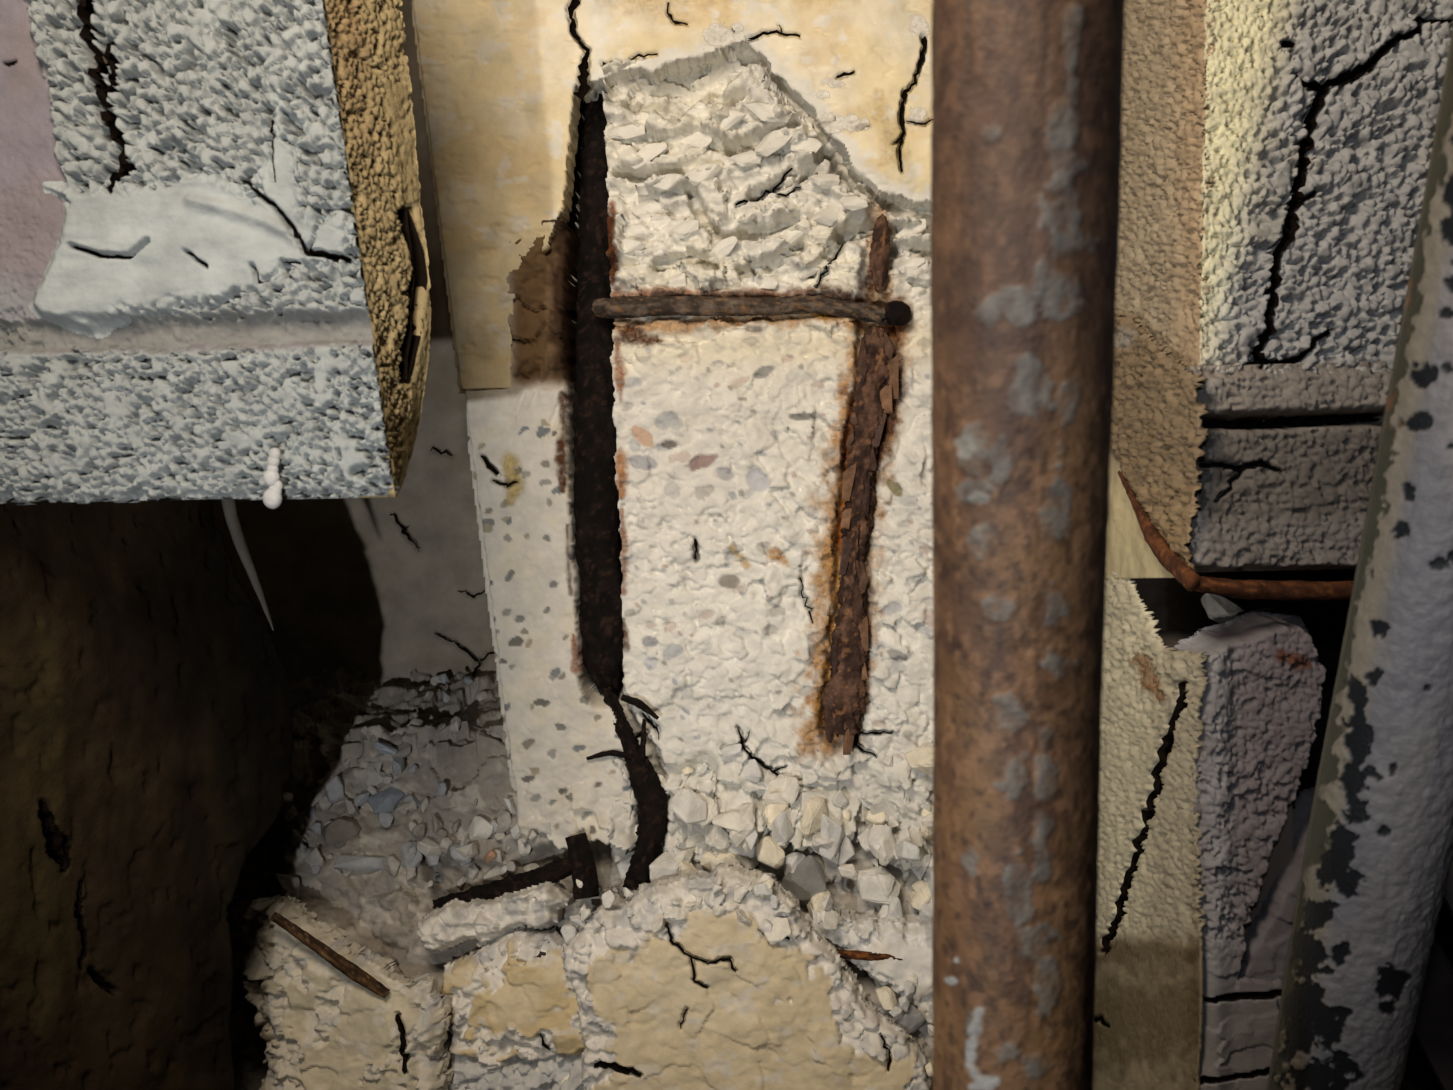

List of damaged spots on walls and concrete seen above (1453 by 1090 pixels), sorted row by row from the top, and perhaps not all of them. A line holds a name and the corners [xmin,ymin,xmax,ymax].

crack [76,0,137,193]
crack [568,0,688,100]
crack [748,25,800,41]
crack [836,70,855,79]
crack [893,36,932,172]
peeling [909,15,929,42]
crack [1203,16,1453,375]
rust [555,391,571,493]
spalling [464,23,934,882]
rust [606,202,907,755]
crack [613,713,660,758]
crack [1101,682,1188,954]